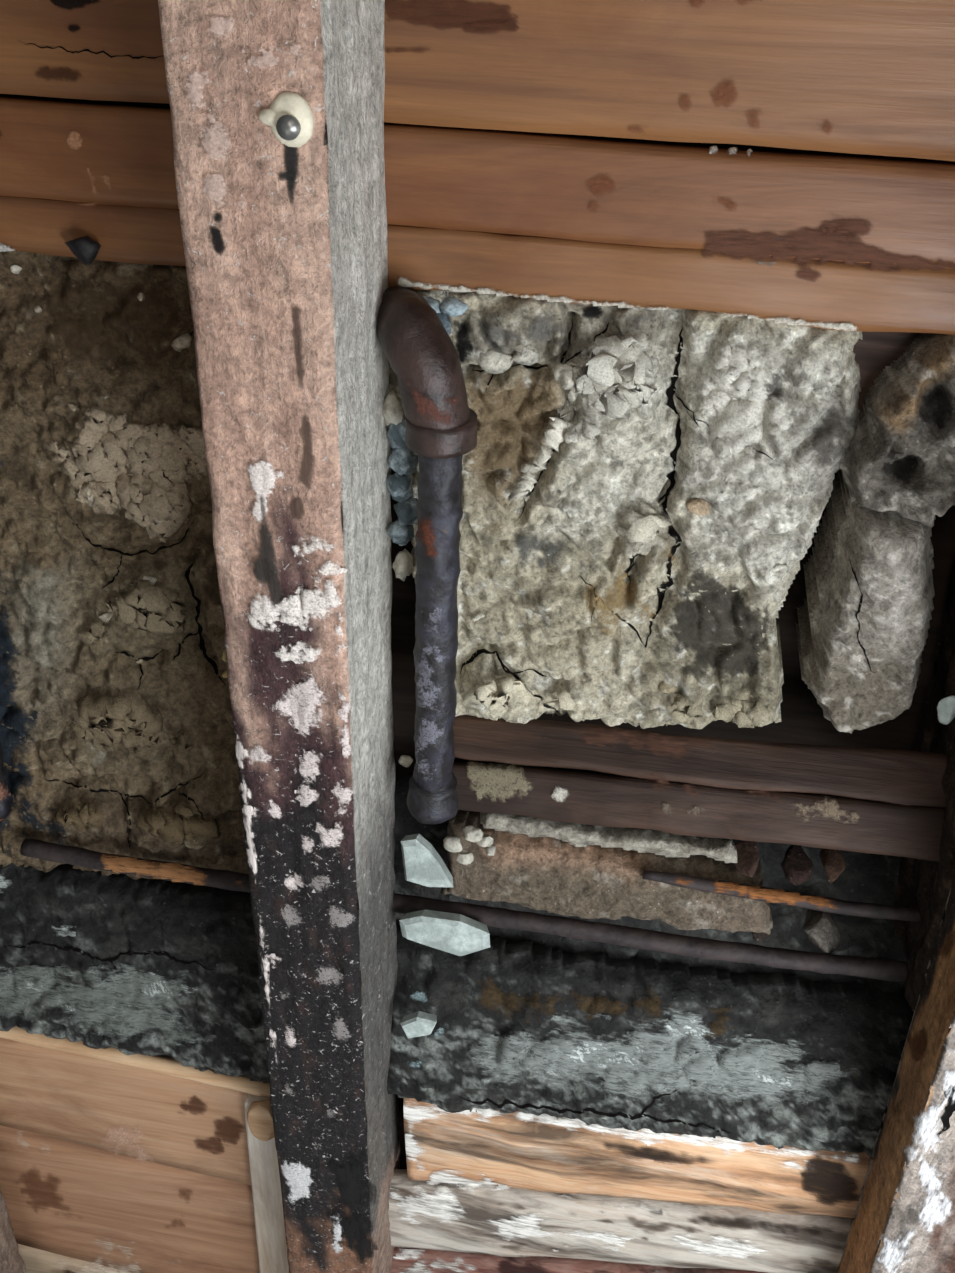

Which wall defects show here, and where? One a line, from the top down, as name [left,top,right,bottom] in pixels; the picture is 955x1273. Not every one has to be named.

damp [703,220,955,281]
crack [578,327,773,650]
crack [72,520,226,690]
crack [849,559,874,673]
corrosion [101,854,206,885]
corrosion [714,879,837,909]
damp [0,963,216,1045]
damp [470,981,846,1108]
damp [327,1154,377,1263]
peeling [390,1105,509,1224]
peeling [490,1214,553,1241]
peeling [518,1112,815,1169]